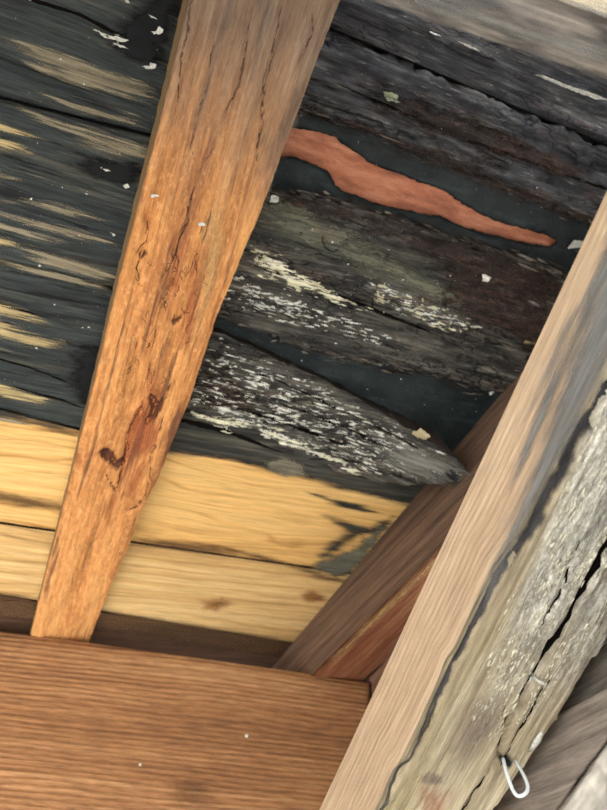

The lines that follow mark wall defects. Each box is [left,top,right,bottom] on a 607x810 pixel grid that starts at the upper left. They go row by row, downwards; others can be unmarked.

peeling [224,245,482,346]
water stain [0,410,74,436]
peeling [188,337,446,480]
water stain [169,416,425,506]
water stain [0,494,61,507]
water stain [311,493,376,513]
water stain [144,540,239,555]
water stain [291,520,389,583]
crack [497,535,607,753]
crack [556,740,607,810]